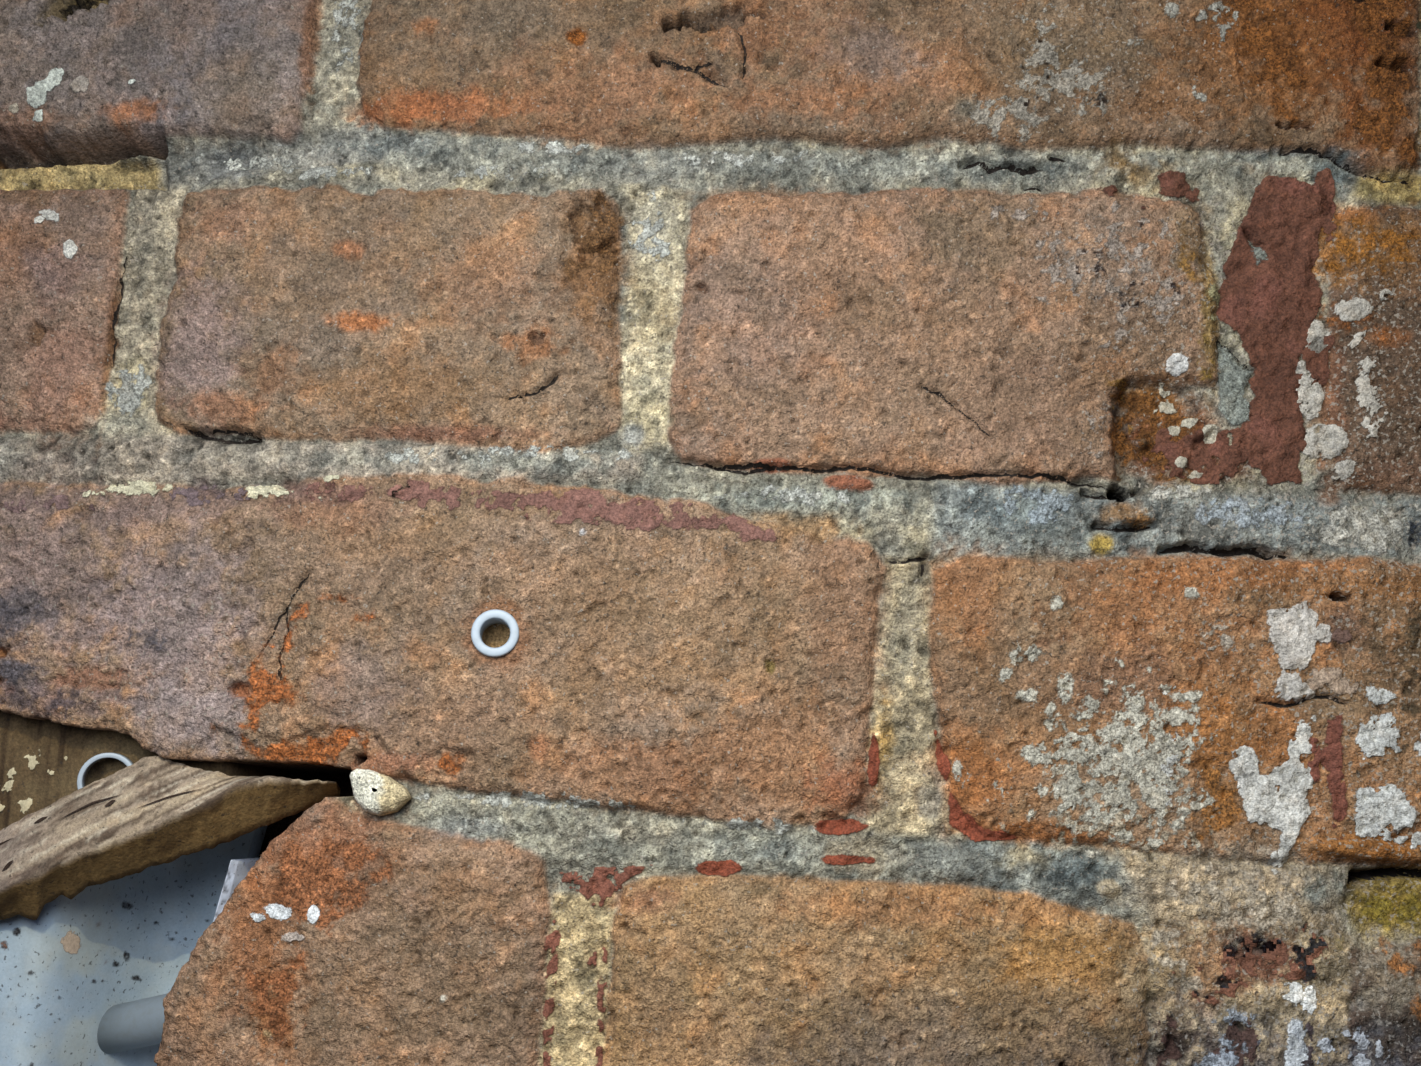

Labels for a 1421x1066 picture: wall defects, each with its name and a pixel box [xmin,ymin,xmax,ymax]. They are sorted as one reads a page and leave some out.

crack [262,573,310,685]
damp [1050,595,1064,611]
damp [1184,587,1199,598]
damp [952,760,969,787]
damp [999,601,1421,937]
damp [1148,926,1202,990]